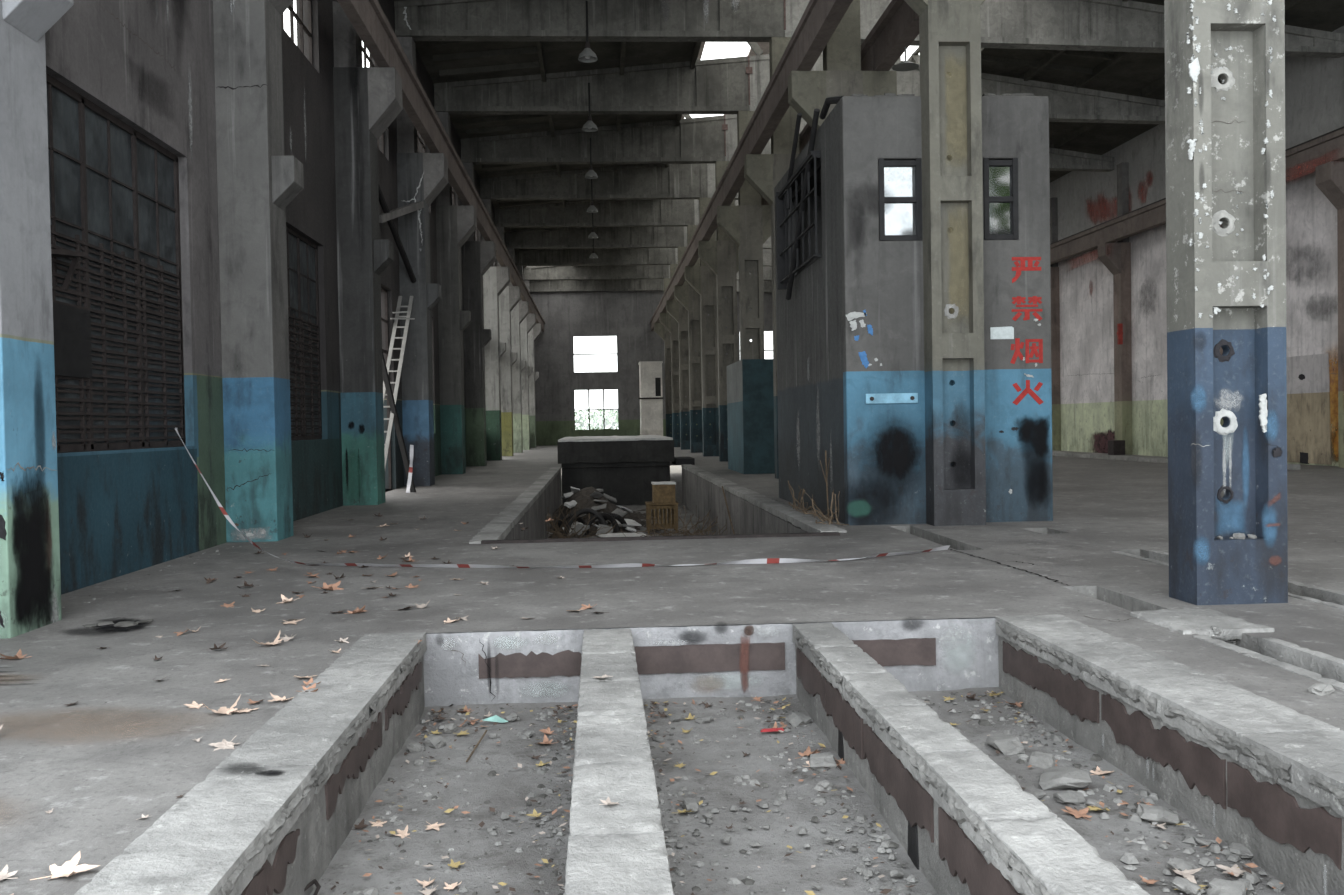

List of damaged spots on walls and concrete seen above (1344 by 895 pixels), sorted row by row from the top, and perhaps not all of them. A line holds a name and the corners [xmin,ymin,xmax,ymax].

peeling [1186,0,1235,160]
spalling [1189,183,1244,291]
peeling [1252,254,1274,308]
rust [1329,355,1339,462]
leakage [13,394,58,623]
spalling [215,617,1292,895]
spalling [1308,775,1344,807]